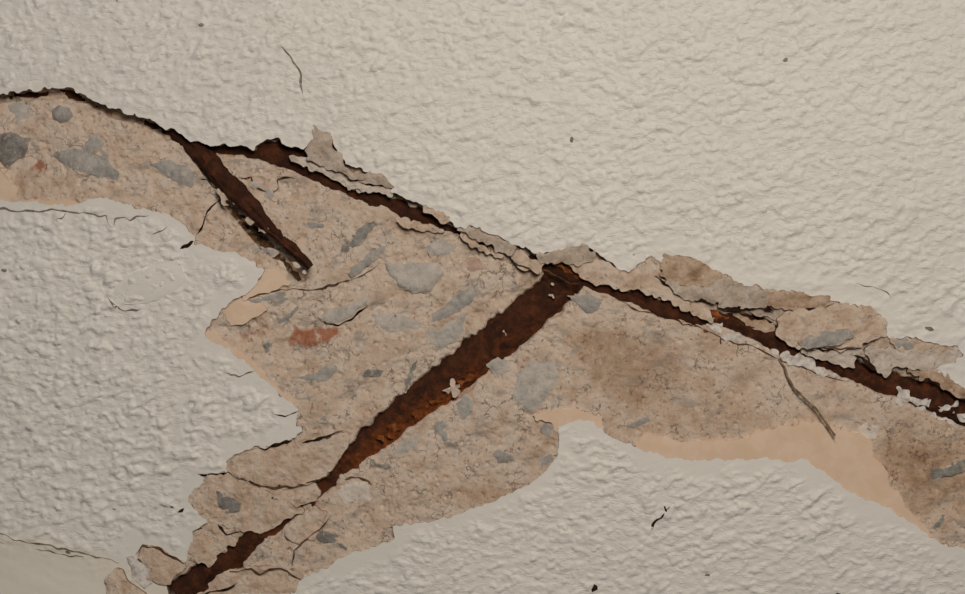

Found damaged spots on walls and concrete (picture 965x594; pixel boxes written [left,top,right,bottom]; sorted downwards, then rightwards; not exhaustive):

spalling [0,89,965,445]
rust [288,327,338,346]
spalling [172,286,965,594]
peeling [105,567,147,594]
peeling [127,545,187,594]